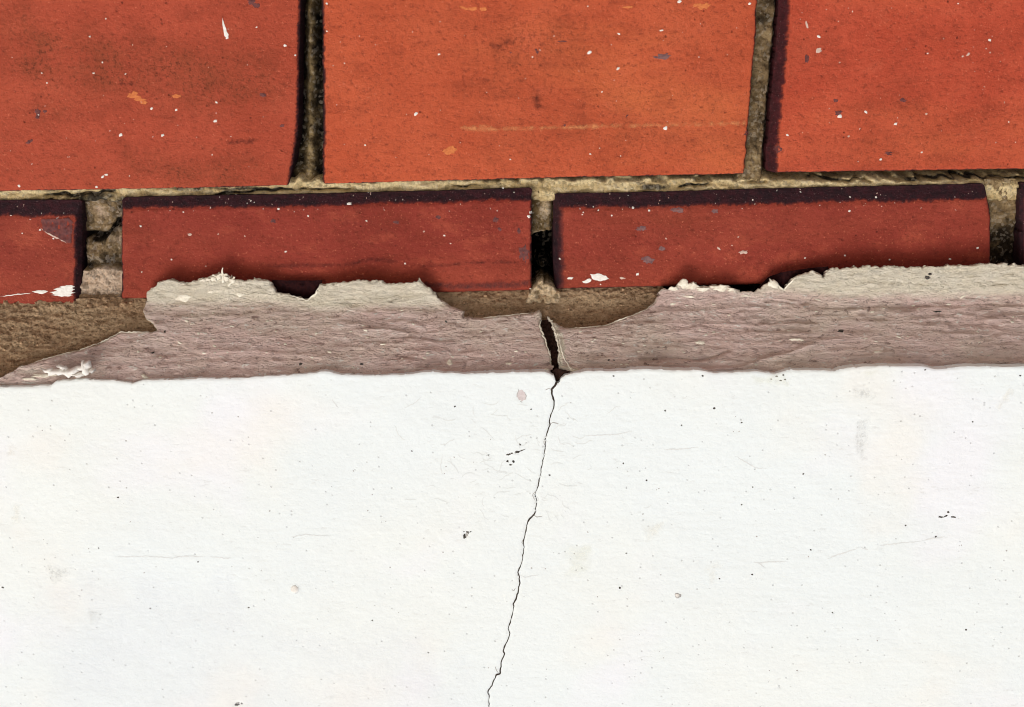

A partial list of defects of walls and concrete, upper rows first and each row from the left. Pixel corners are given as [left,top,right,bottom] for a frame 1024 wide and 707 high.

spalling [0,297,166,380]
peeling [200,268,246,308]
spalling [272,280,322,301]
spalling [436,266,829,342]
crack [404,320,627,706]